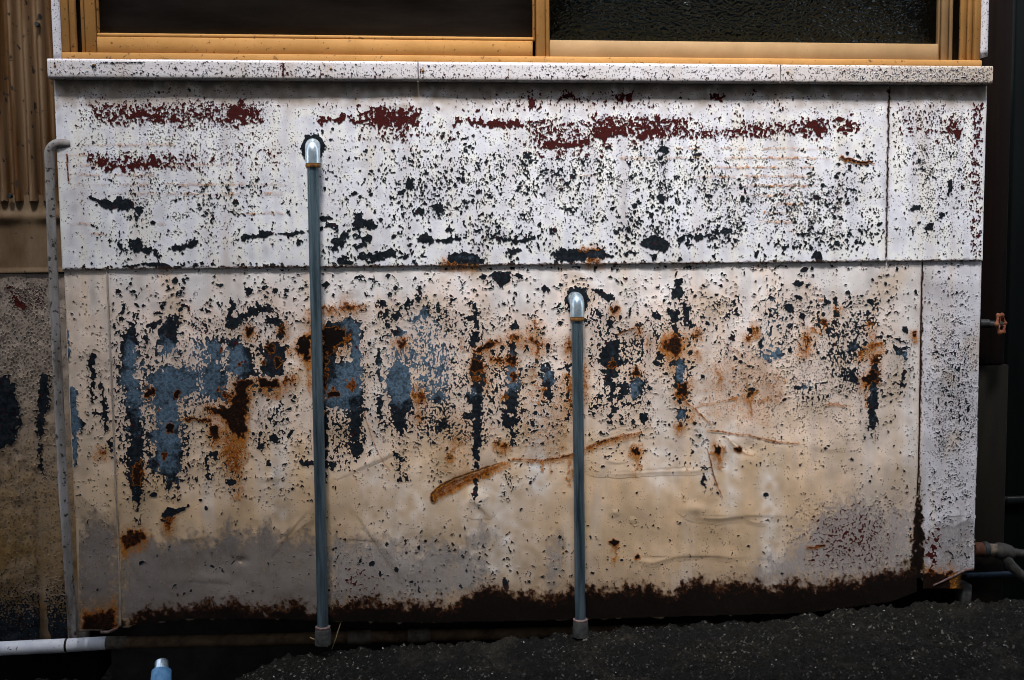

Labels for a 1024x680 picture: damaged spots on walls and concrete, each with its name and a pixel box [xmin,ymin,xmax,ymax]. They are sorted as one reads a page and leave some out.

peeling [66,87,984,532]
corrosion [80,89,981,629]
peeling [328,567,406,604]
peeling [796,494,903,584]
peeling [924,524,948,572]